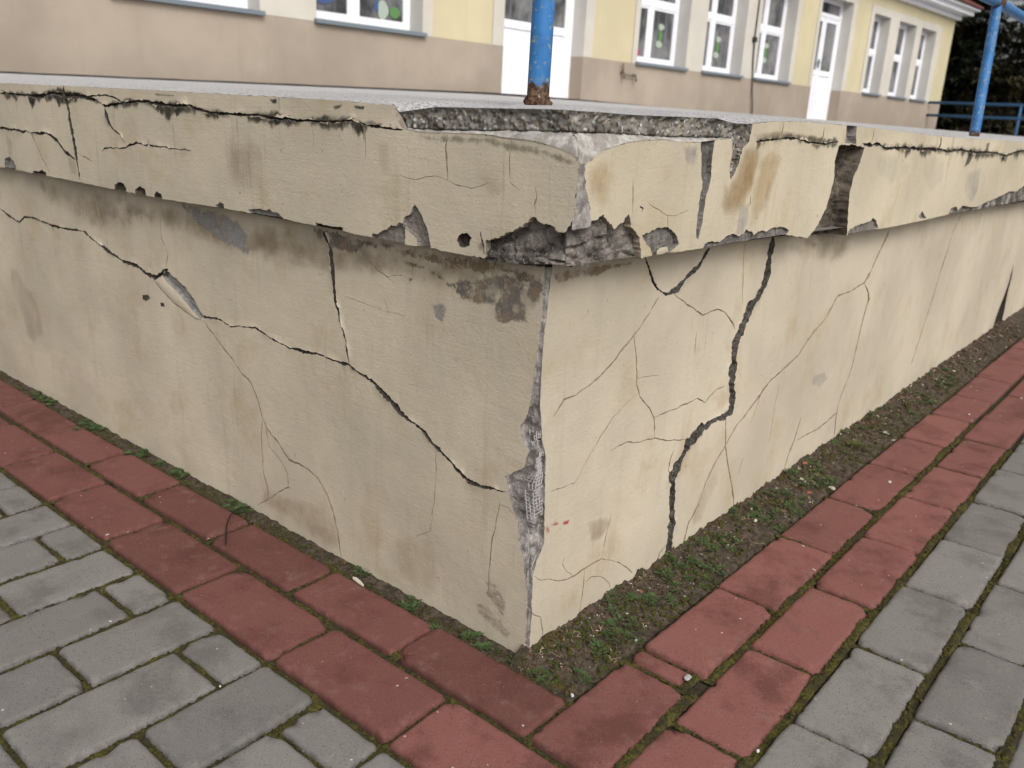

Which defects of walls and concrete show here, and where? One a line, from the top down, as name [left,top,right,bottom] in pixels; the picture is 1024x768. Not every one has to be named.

crack [0,86,403,178]
spalling [391,104,752,179]
crack [863,132,1024,166]
crack [0,208,168,280]
spalling [704,227,789,247]
crack [911,214,962,364]
crack [994,264,1014,324]
crack [551,140,889,558]
crack [202,231,514,588]
spalling [372,204,679,648]